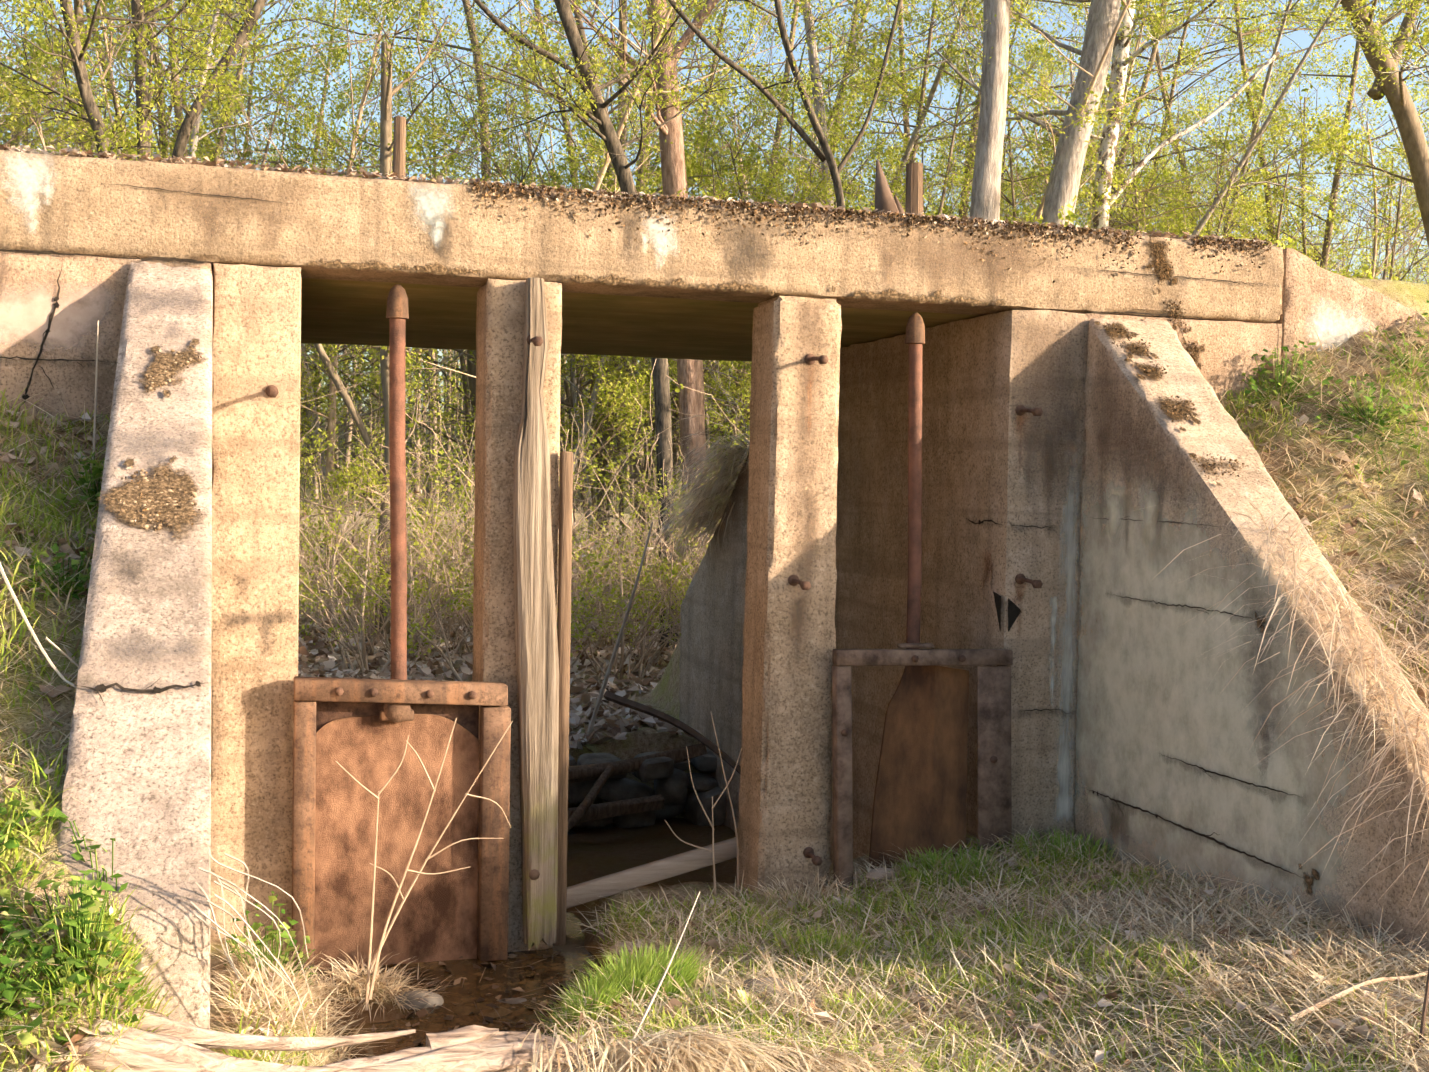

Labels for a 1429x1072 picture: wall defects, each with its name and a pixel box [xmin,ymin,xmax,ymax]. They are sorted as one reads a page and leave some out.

water stain [8,157,49,226]
water stain [434,222,448,244]
crack [0,249,211,412]
crack [1120,596,1266,624]
crack [74,680,203,703]
crack [1159,753,1298,796]
crack [1089,790,1302,878]